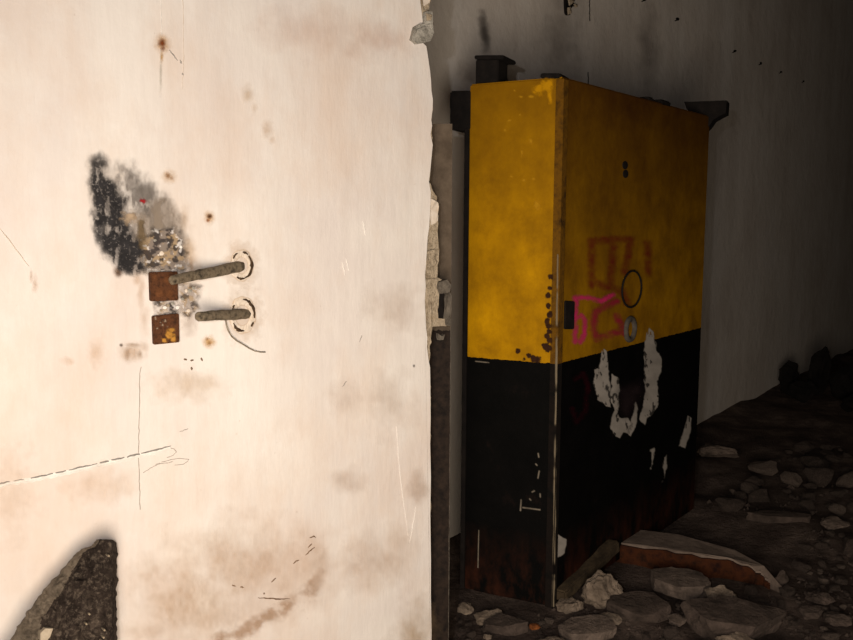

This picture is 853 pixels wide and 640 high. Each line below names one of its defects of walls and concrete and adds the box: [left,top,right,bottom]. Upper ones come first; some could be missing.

peeling [143,229,185,272]
flaking render [230,249,254,282]
peeling [155,283,200,317]
crack [0,368,189,510]